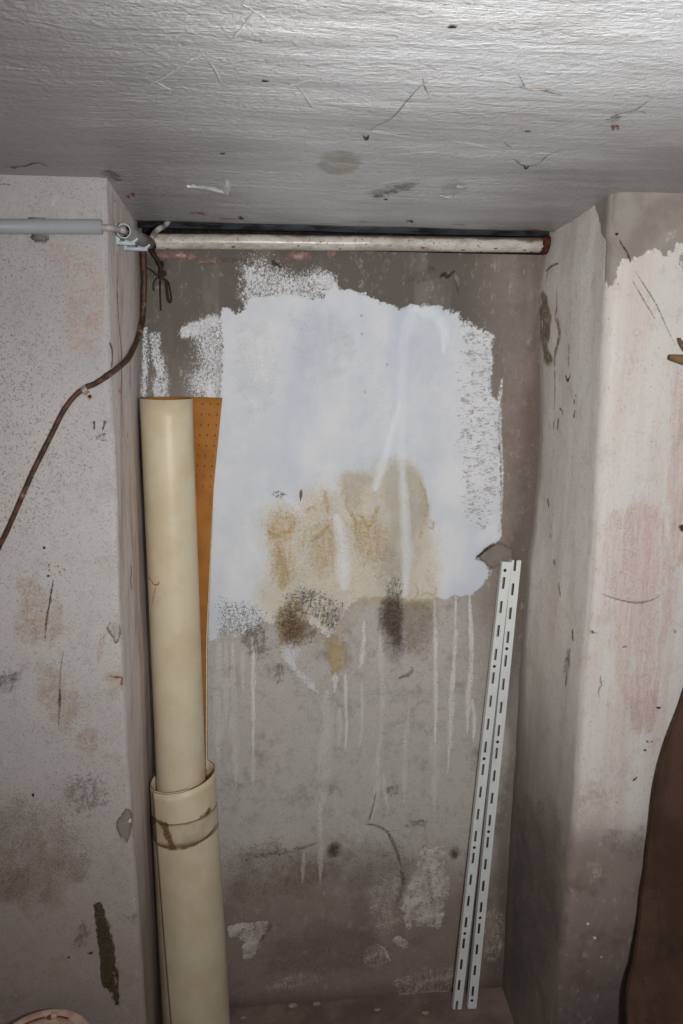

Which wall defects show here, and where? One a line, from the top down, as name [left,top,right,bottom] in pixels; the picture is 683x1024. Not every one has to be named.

peeling [595,192,683,287]
spalling [476,542,516,569]
water stain [212,453,444,763]